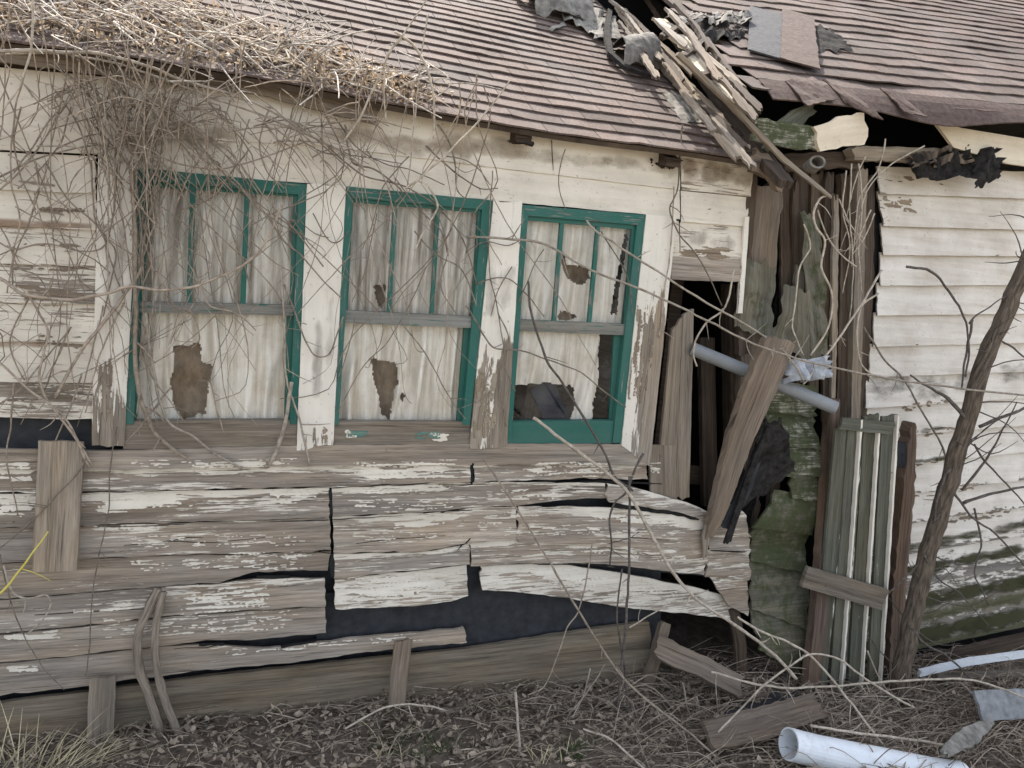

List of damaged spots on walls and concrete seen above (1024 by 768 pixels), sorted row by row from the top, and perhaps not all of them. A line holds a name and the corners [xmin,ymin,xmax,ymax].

peeling [40,207,85,215]
peeling [679,246,733,260]
peeling [15,284,85,301]
peeling [36,335,83,349]
peeling [628,305,655,404]
peeling [0,462,35,481]
peeling [131,458,297,475]
peeling [0,496,33,517]
peeling [92,492,308,571]
crack [517,479,703,576]
peeling [73,585,299,638]
peeling [4,630,61,640]